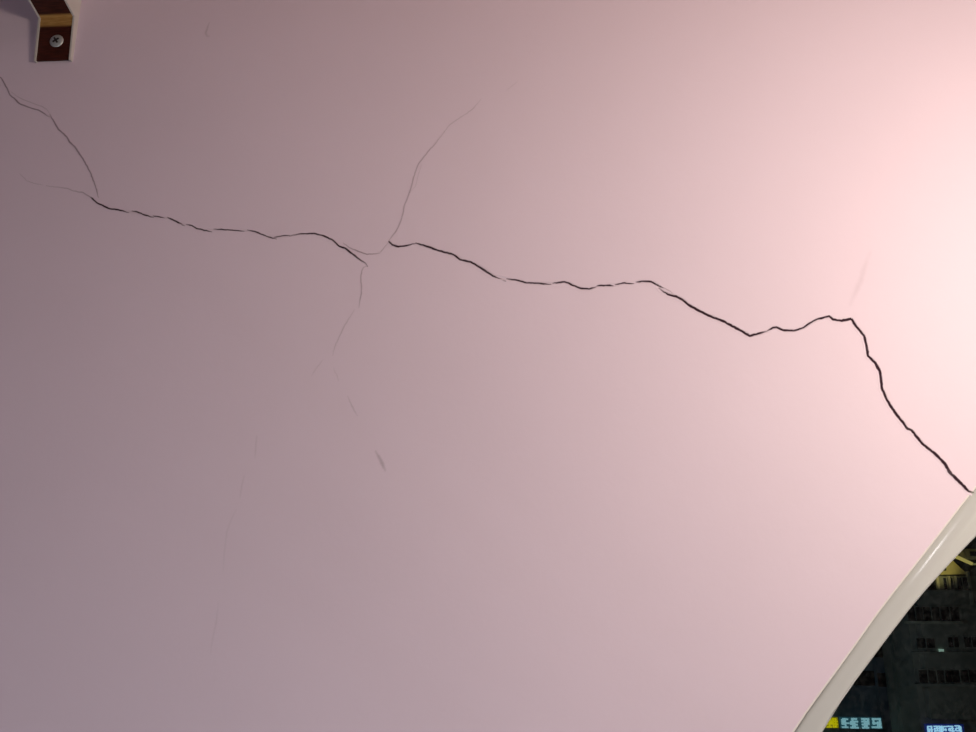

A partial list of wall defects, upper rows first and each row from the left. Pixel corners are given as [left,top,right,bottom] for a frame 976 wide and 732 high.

crack [89,198,367,265]
crack [386,239,974,496]